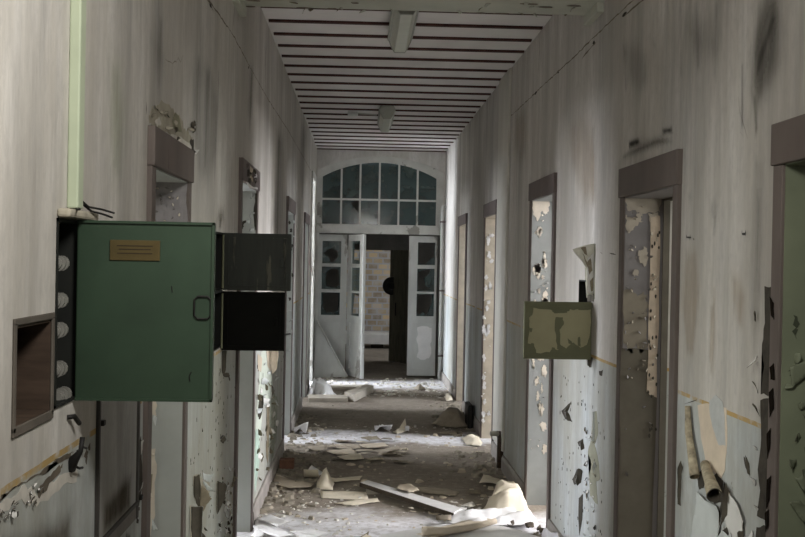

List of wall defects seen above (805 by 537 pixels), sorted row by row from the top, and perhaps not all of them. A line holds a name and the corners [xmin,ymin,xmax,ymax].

flaking render [149,100,199,155]
peeling [533,201,550,238]
peeling [482,275,492,340]
peeling [532,251,549,302]
peeling [572,244,596,302]
peeling [623,197,661,398]
peeling [254,349,290,492]
peeling [529,359,547,454]
peeling [677,286,771,537]
peeling [0,452,78,523]
peeling [190,466,238,537]
peeling [558,391,605,537]